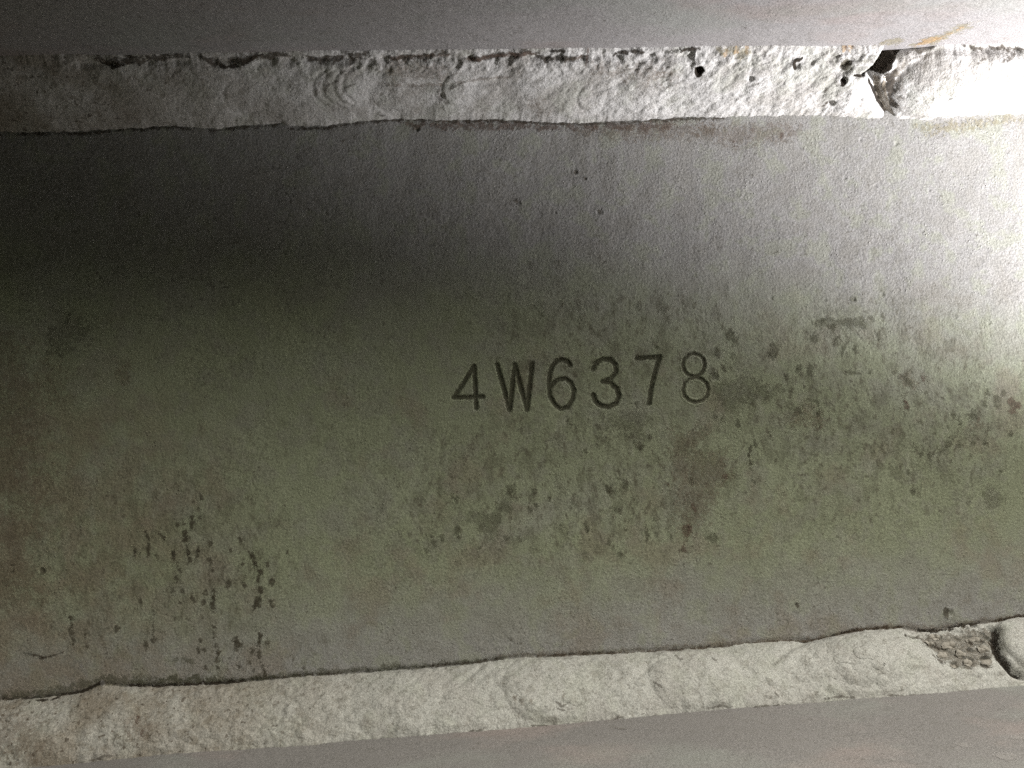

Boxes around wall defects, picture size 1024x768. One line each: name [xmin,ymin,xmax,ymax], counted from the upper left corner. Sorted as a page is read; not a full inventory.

water stain [171,492,275,610]
water stain [232,630,270,677]
peeling [904,634,992,668]